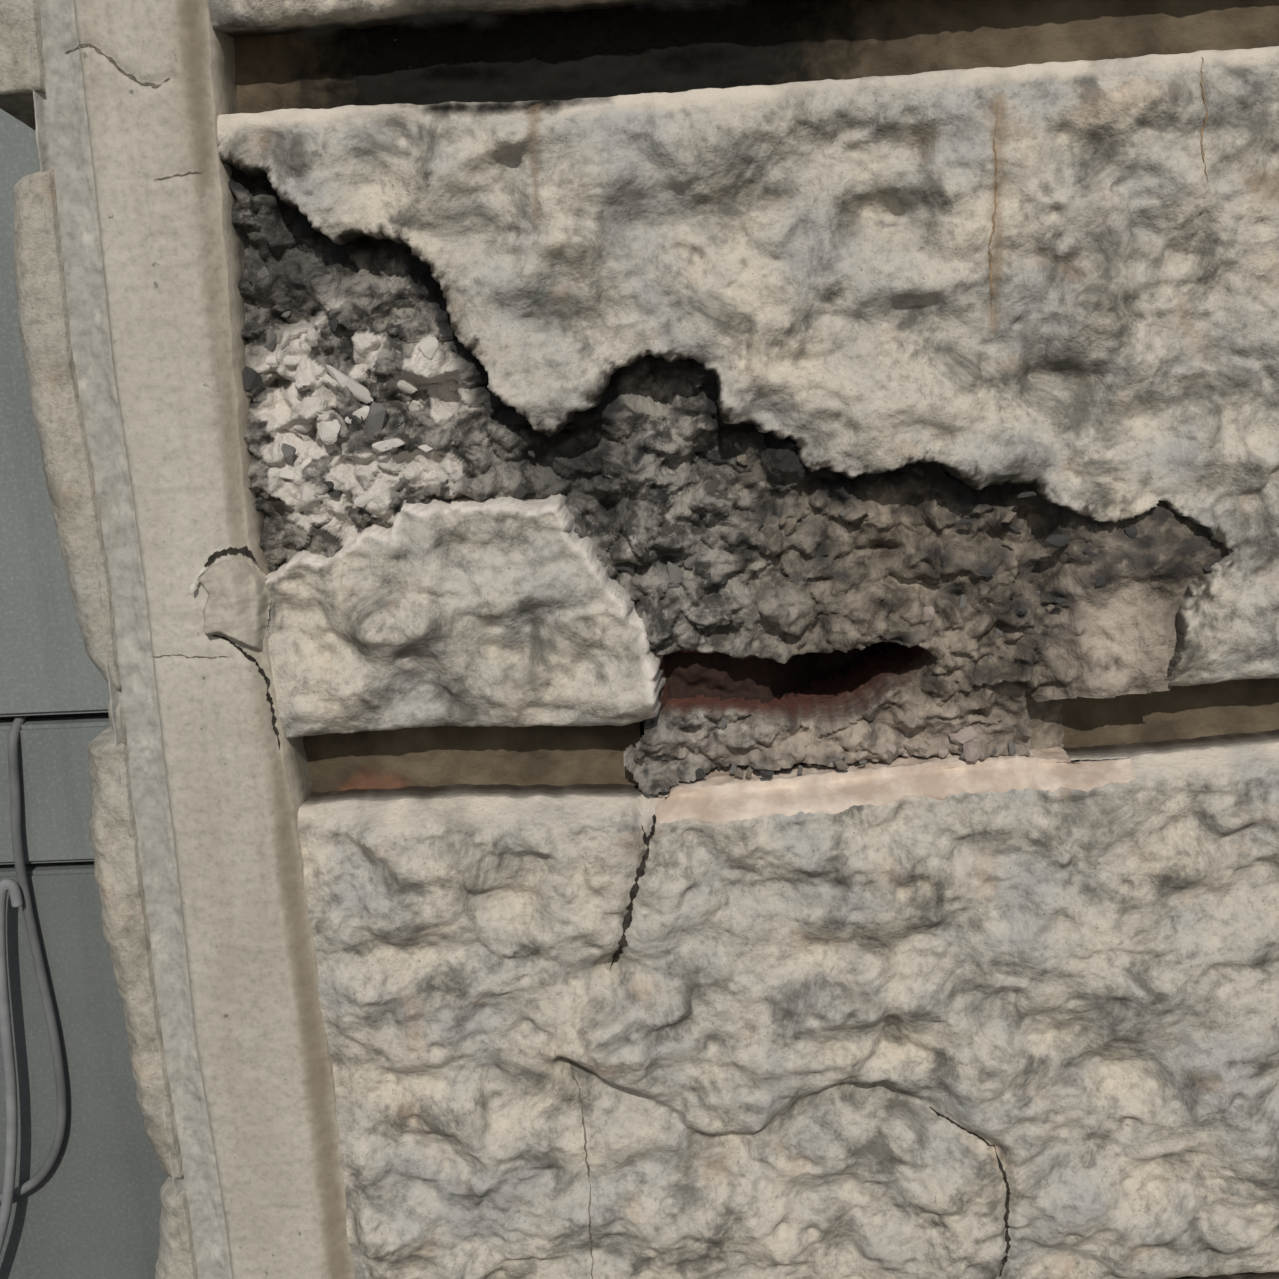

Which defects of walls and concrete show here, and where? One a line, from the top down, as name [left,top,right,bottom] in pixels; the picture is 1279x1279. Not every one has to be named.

crack [65,43,169,88]
spalling [190,165,1228,824]
crack [153,634,280,748]
crack [610,814,656,970]
crack [930,1107,1011,1277]